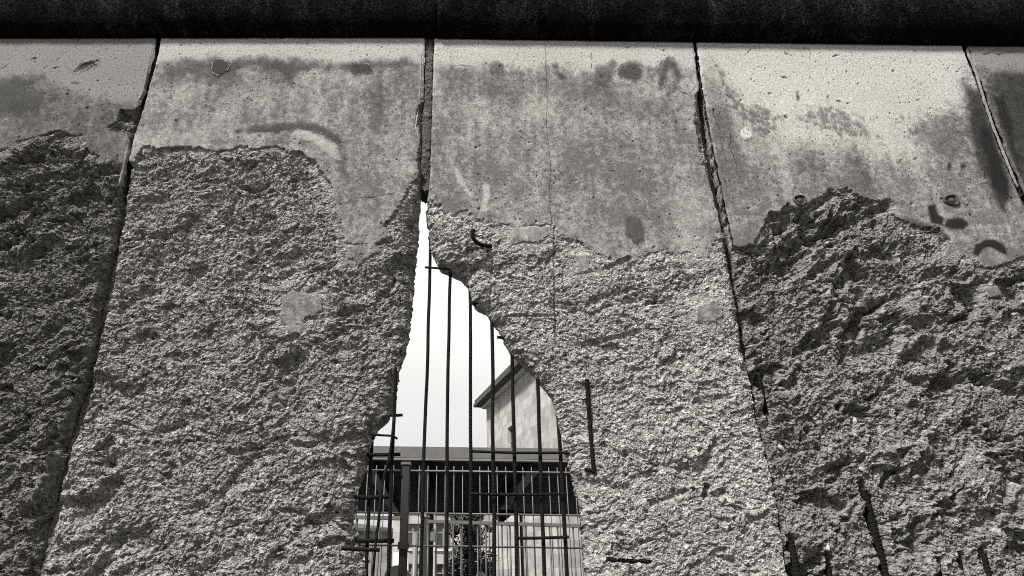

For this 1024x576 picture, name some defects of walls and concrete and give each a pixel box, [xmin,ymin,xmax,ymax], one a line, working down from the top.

water stain [658,59,680,88]
water stain [966,74,1024,208]
water stain [625,216,644,244]
spalling [0,102,424,576]
spalling [419,185,1024,576]